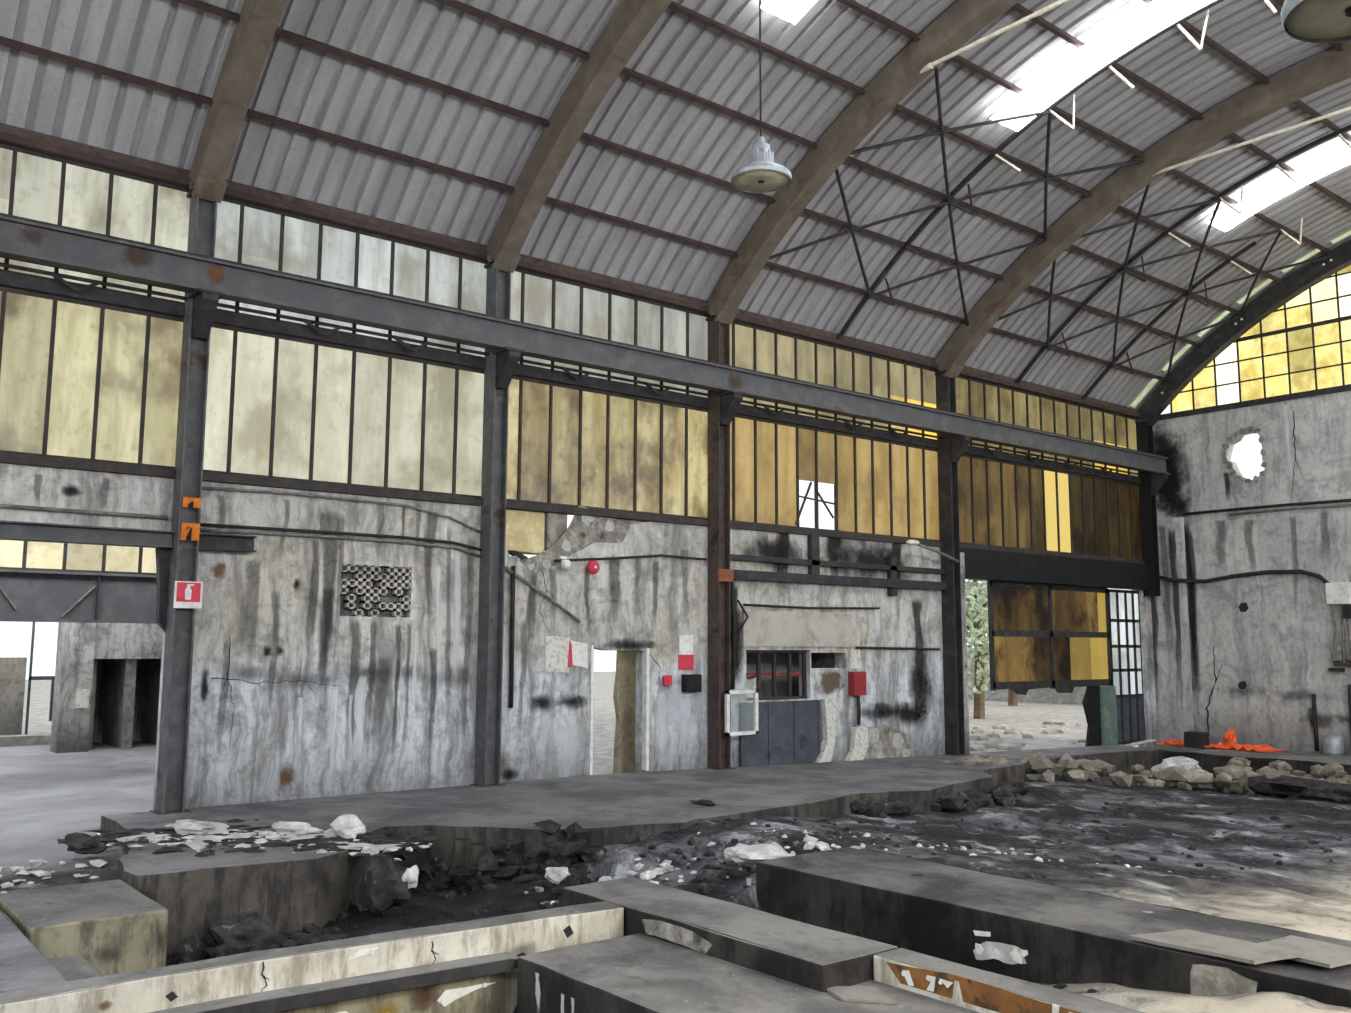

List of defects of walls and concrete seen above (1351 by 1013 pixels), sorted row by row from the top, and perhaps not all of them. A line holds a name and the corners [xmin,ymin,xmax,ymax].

spalling [1221,426,1267,483]
damp [1169,526,1199,674]
damp [912,602,924,712]
corrosion [281,769,292,783]
spalling [973,930,1028,965]
peeling [886,962,1082,1013]